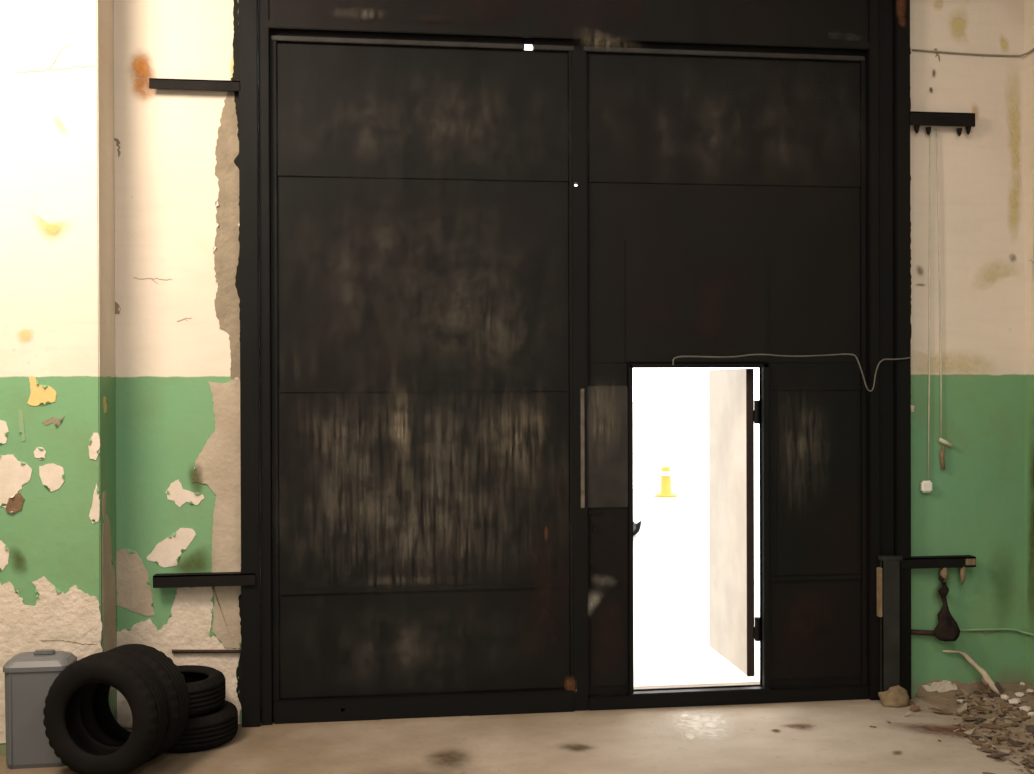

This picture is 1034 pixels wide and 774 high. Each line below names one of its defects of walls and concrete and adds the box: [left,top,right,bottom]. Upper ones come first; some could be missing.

rust [897,0,905,26]
crack [16,45,94,73]
rust [133,57,149,97]
flaking render [166,91,241,572]
peeling [0,376,65,514]
peeling [88,433,100,460]
peeling [0,483,241,743]